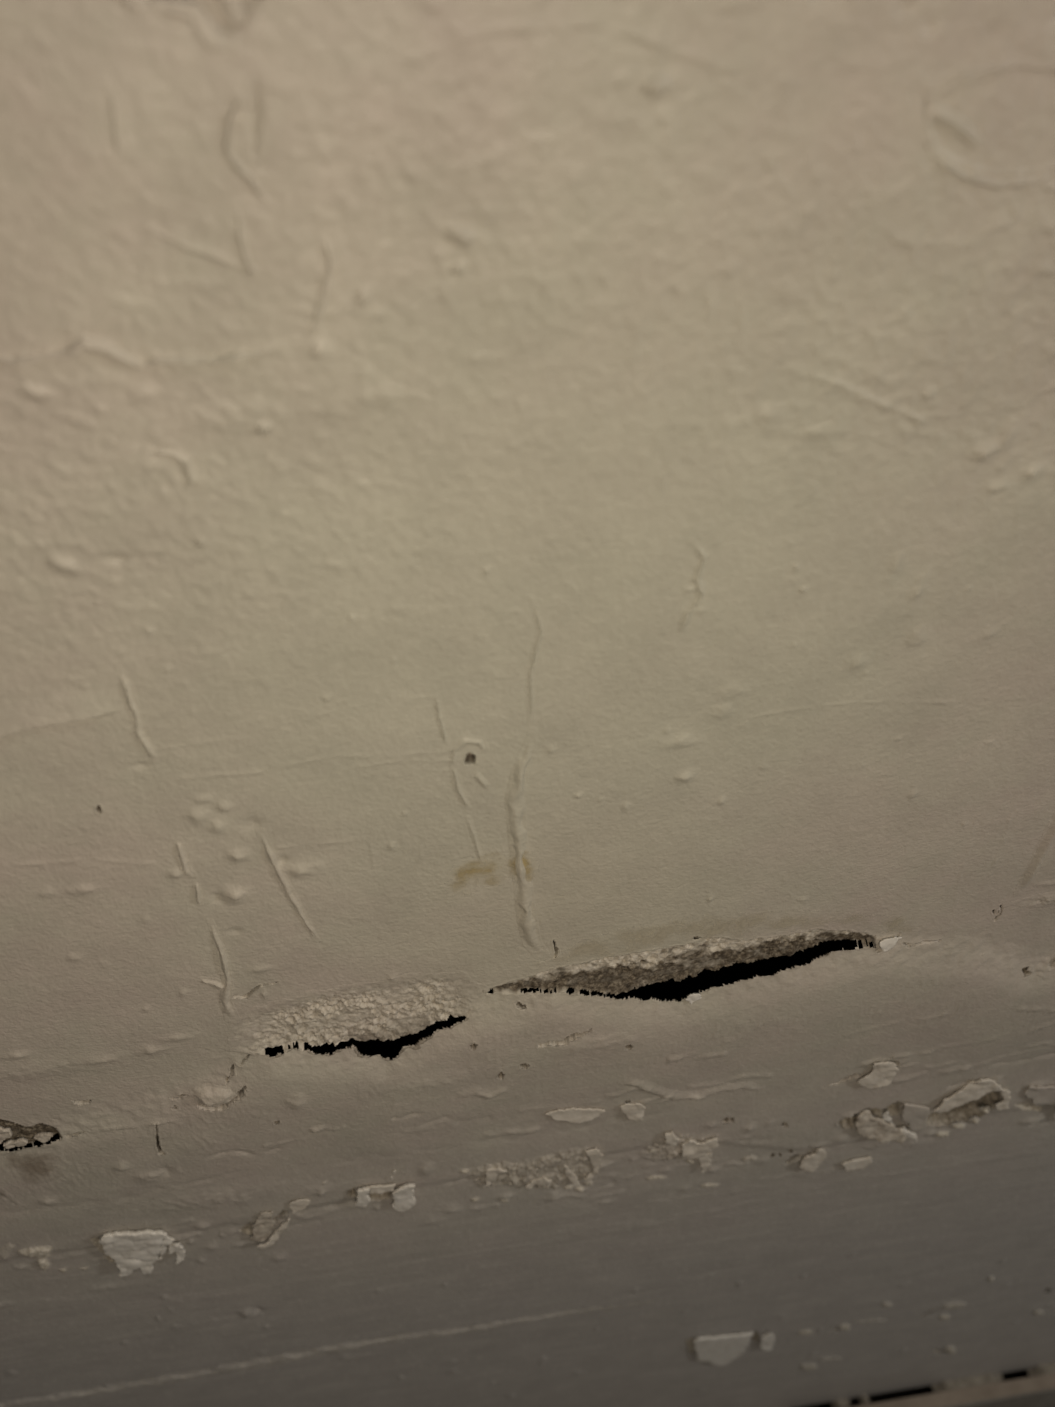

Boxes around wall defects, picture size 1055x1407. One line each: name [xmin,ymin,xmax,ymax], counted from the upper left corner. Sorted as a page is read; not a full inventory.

flaking render [224,927,943,1061]
flaking render [0,1118,91,1154]
peeling [741,1078,1055,1173]
peeling [458,1144,603,1202]
peeling [0,1229,185,1277]
peeling [684,1330,775,1367]